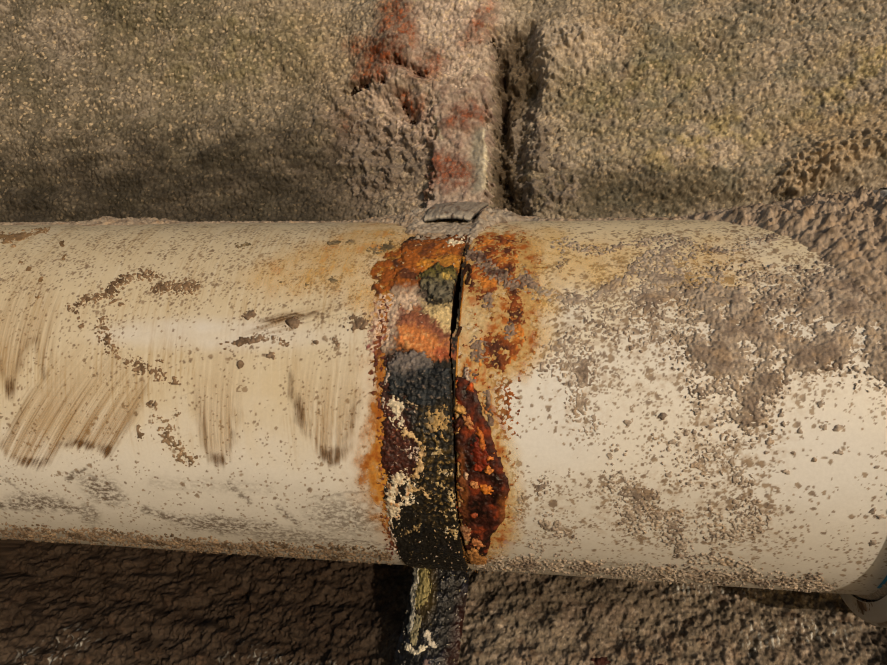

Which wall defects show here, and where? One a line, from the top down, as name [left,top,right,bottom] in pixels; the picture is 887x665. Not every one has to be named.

corrosion [356,231,402,560]
corrosion [449,224,554,573]